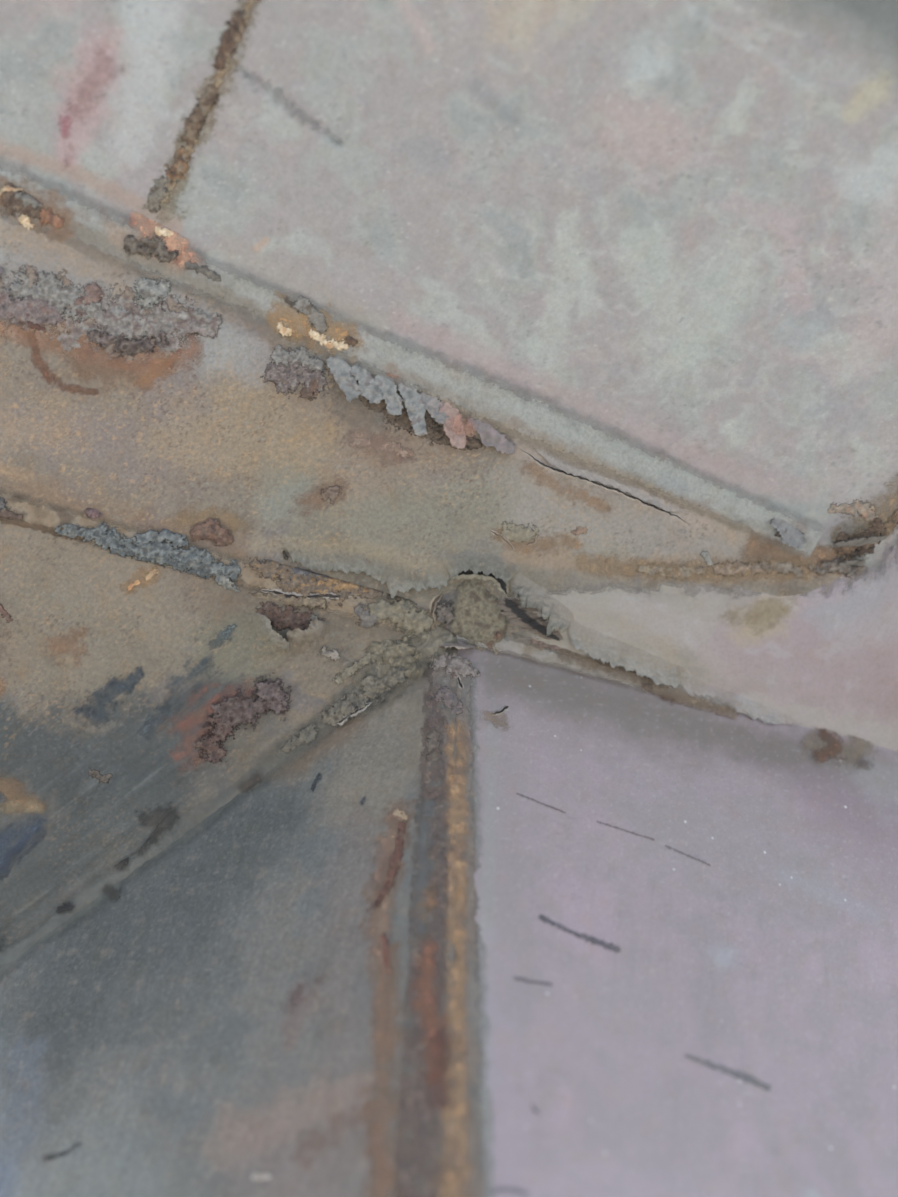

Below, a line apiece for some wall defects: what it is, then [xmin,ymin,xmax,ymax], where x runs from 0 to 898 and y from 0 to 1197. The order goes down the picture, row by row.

corrosion [123,0,262,282]
corrosion [0,177,72,238]
corrosion [0,264,222,388]
corrosion [260,295,383,427]
peeling [326,353,516,454]
corrosion [0,497,242,594]
crack [518,441,693,525]
corrosion [577,475,898,584]
corrosion [178,673,292,764]
corrosion [280,591,503,754]
peeling [509,573,806,726]
corrosion [360,800,417,1064]